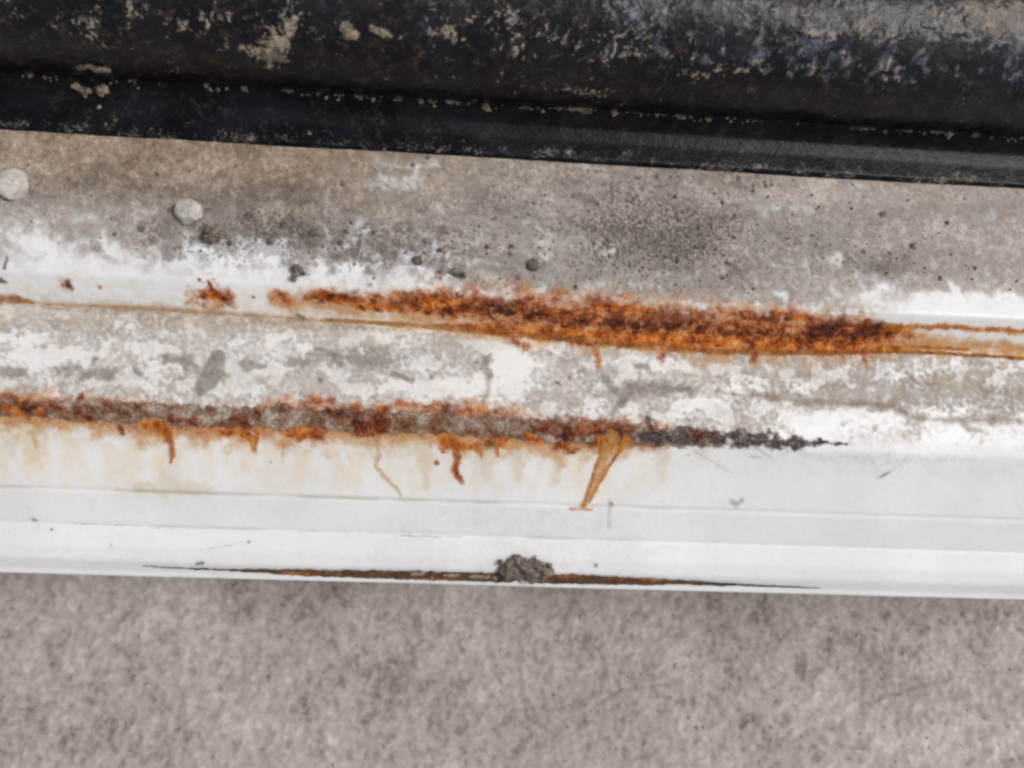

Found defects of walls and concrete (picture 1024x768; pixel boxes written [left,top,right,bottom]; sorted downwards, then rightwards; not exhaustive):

rust [0,296,33,304]
rust [186,278,235,317]
rust [268,270,1024,369]
rust [0,392,147,435]
rust [140,400,270,463]
rust [283,426,324,443]
rust [284,394,517,438]
rust [429,434,510,484]
rust [525,416,672,511]